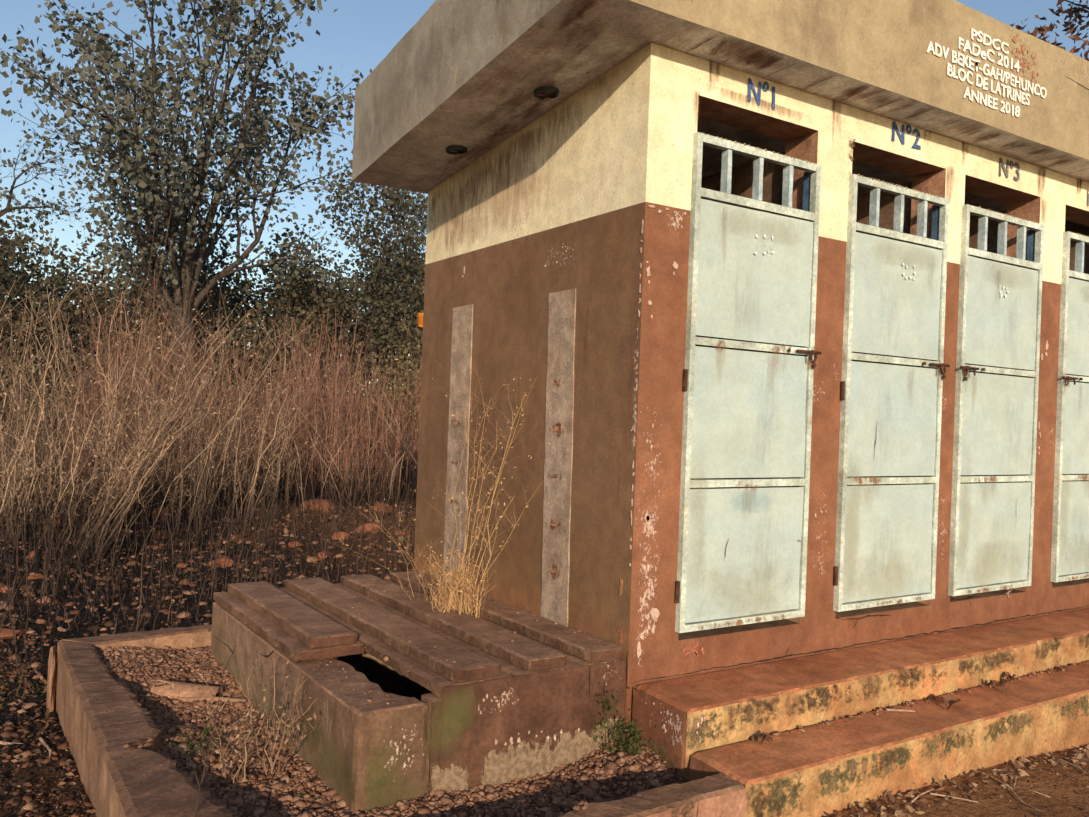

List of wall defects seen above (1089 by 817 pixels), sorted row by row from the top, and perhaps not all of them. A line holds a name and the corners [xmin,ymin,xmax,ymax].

peeling [648,205,686,235]
peeling [610,219,664,665]
damp [865,650,1016,697]
damp [687,685,850,749]
damp [1055,695,1089,719]
peeling [384,724,424,782]
damp [819,714,1033,795]
damp [748,779,805,817]